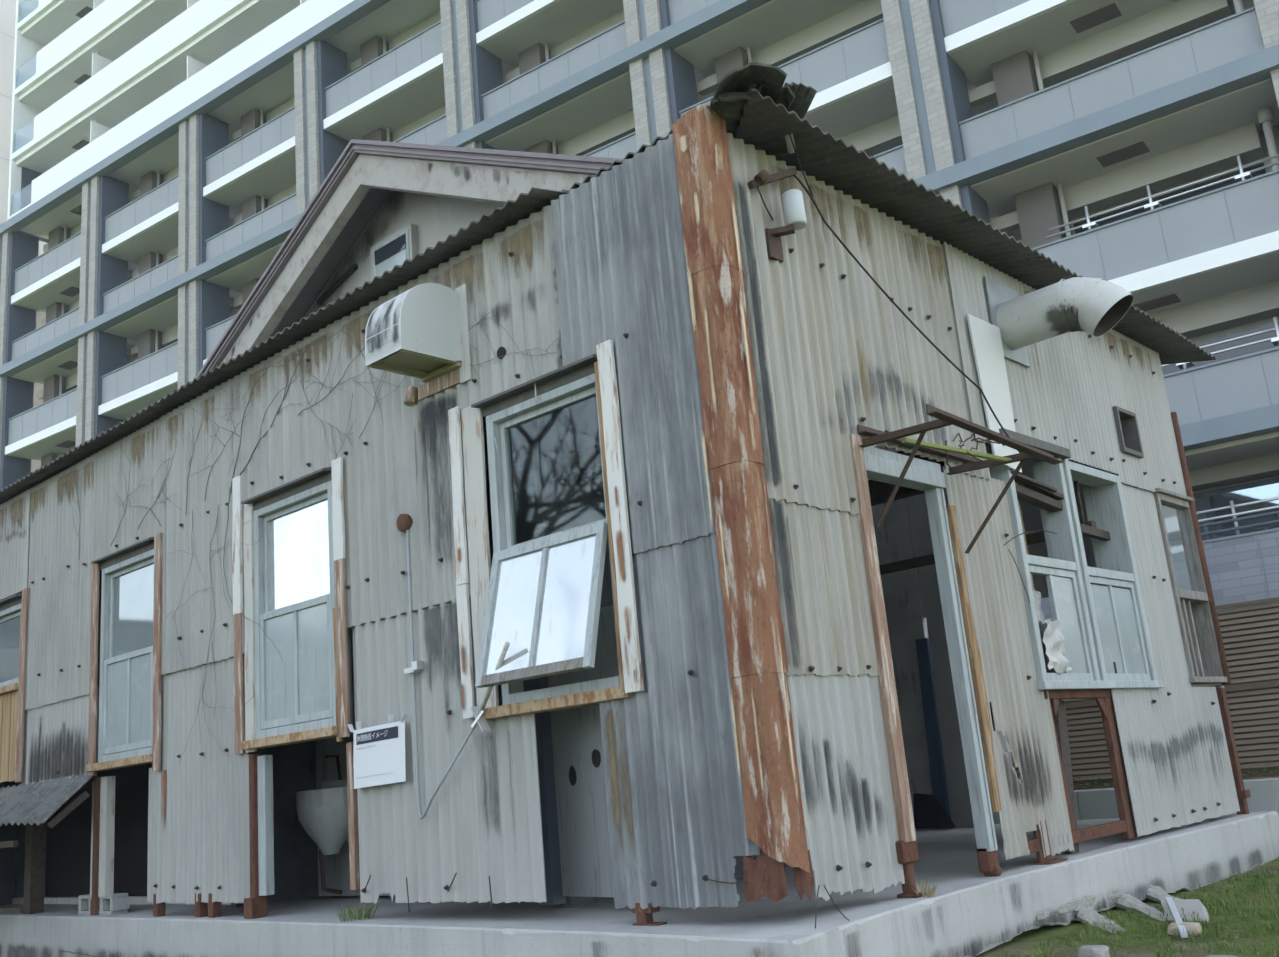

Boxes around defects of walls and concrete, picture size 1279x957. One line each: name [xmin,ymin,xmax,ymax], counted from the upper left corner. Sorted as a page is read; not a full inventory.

leakage [414,396,456,551]
leakage [800,741,880,830]
leakage [1129,725,1222,780]
leakage [0,946,61,957]